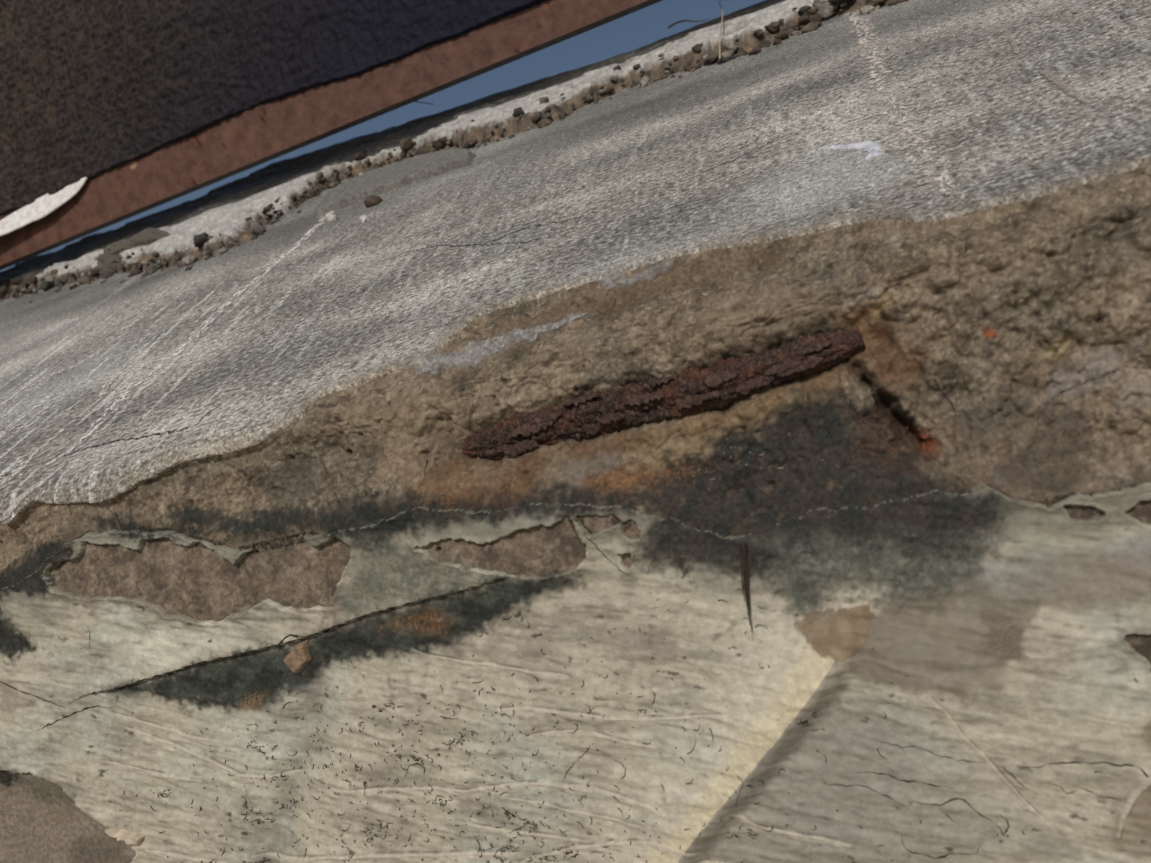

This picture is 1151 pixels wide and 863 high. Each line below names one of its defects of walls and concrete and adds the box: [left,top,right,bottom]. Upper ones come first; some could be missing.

spalling [0,165,1151,622]
corrosion [504,420,554,457]
peeling [283,638,311,673]